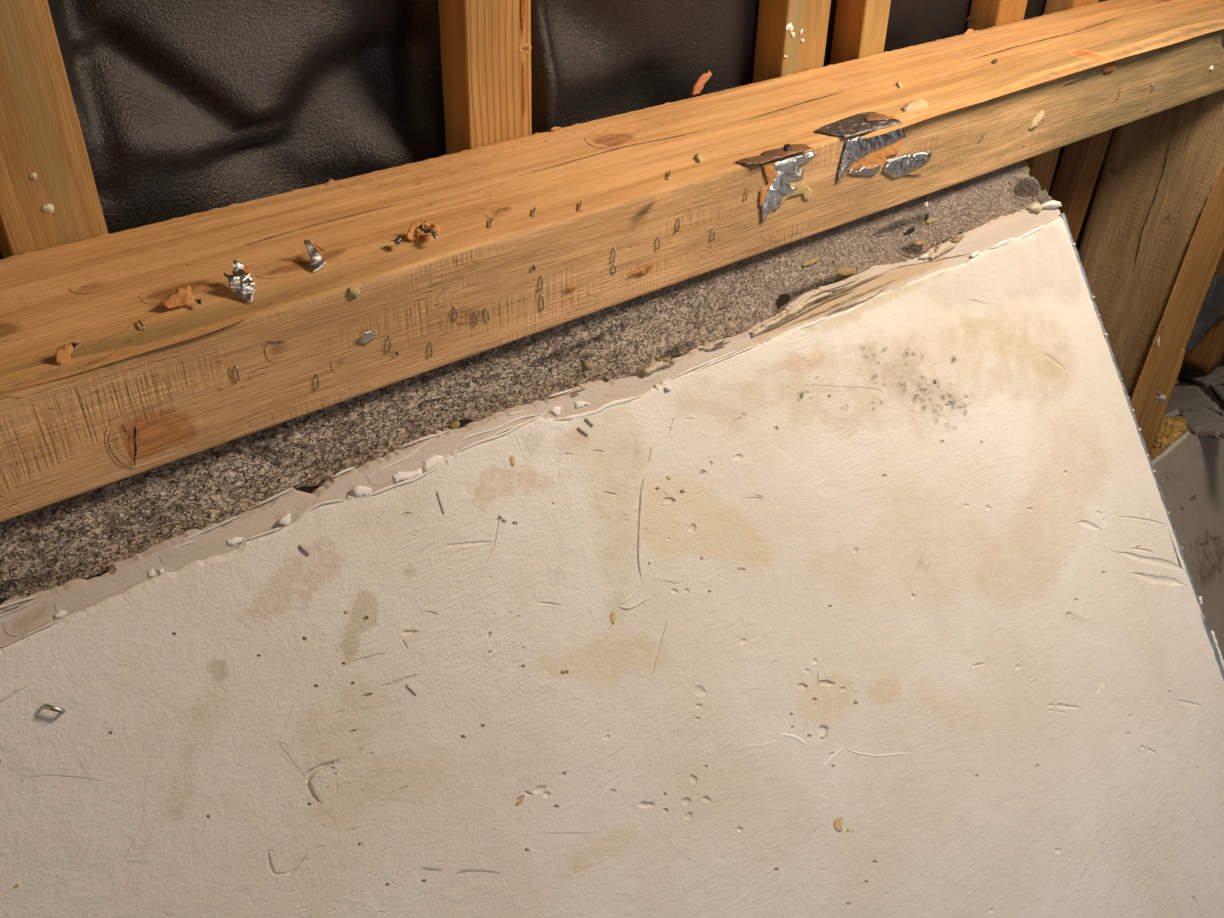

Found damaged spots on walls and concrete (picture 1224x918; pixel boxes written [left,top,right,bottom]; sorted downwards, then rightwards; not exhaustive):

flaking render [918,235,964,260]
flaking render [971,200,1062,257]
flaking render [640,276,869,392]
flaking render [226,389,641,546]
damp [516,213,1087,694]
flaking render [0,596,39,624]
flaking render [170,488,293,551]
peeling [234,535,350,630]
damp [1184,511,1224,601]
damp [278,587,477,847]
damp [557,667,1001,894]